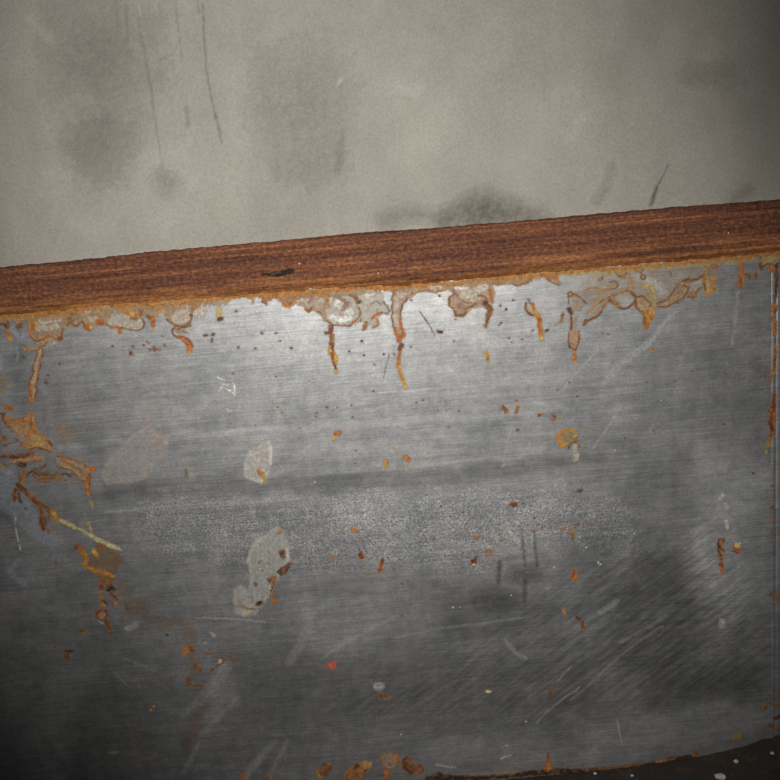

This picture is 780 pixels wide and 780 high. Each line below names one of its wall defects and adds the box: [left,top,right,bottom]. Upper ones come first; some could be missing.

corrosion [0,252,780,403]
corrosion [0,406,96,533]
corrosion [557,428,581,462]
corrosion [765,393,776,454]
corrosion [717,538,741,574]
corrosion [74,544,127,634]
corrosion [344,749,700,780]